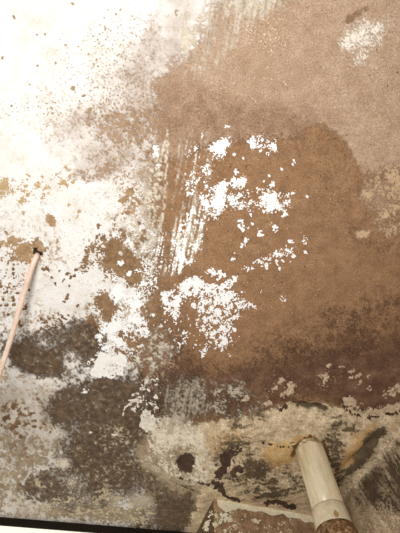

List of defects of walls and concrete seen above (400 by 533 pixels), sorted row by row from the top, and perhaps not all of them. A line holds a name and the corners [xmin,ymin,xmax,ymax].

damp [80,162,114,181]
peeling [0,133,296,379]
damp [8,319,107,379]
damp [23,459,85,509]
damp [213,434,306,499]
damp [324,415,400,533]